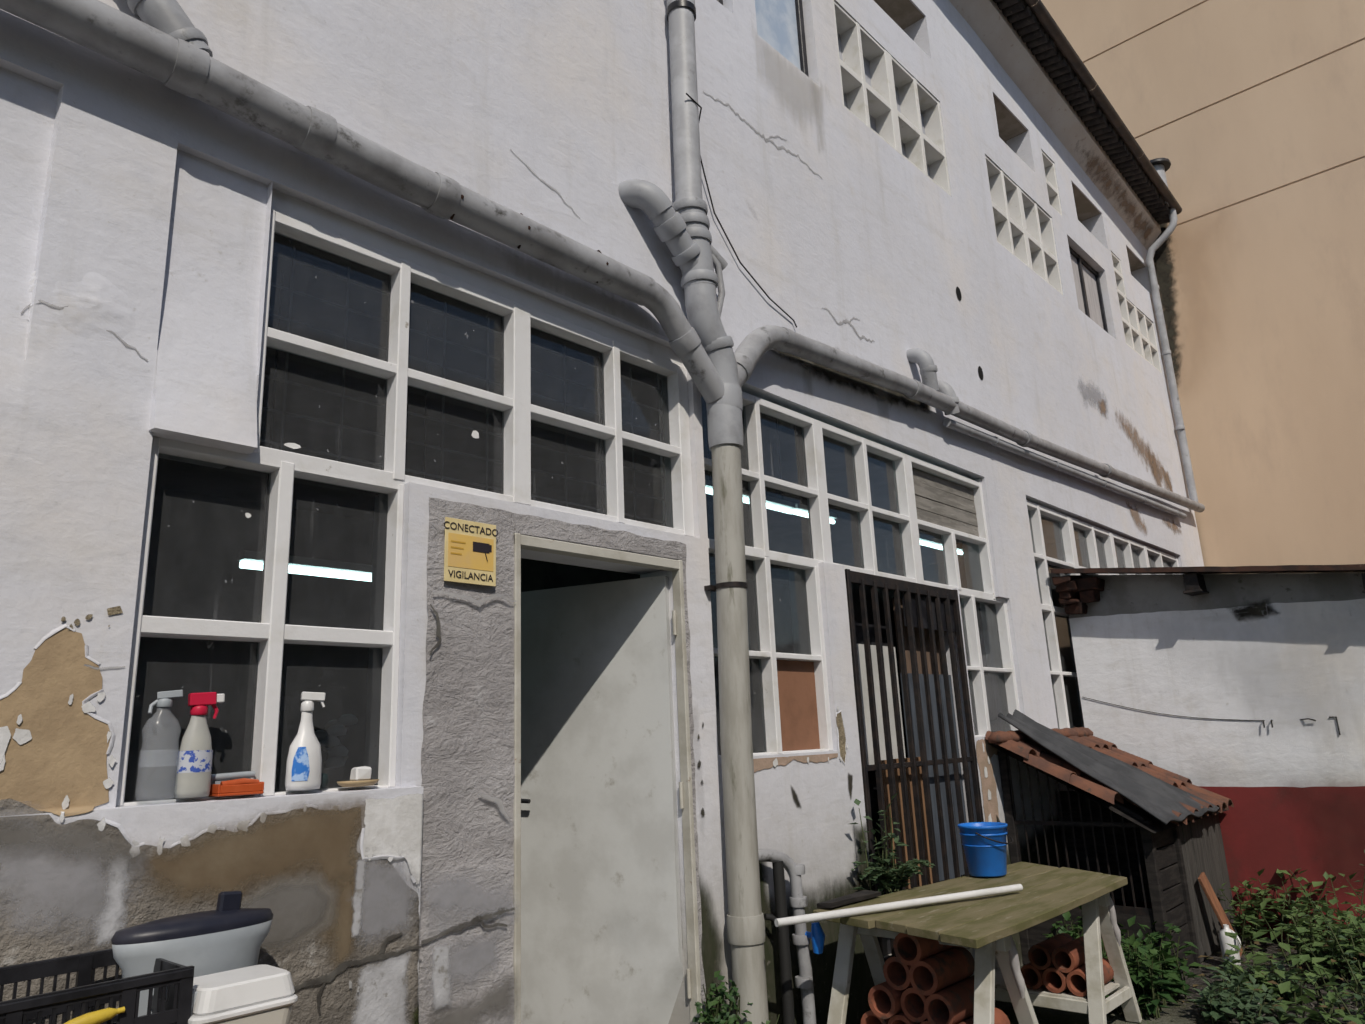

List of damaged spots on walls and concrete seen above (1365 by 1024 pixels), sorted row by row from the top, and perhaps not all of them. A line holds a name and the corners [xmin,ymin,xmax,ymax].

crack [703,91,822,178]
crack [510,149,580,218]
crack [21,300,68,314]
crack [107,330,148,361]
crack [822,308,875,343]
water stain [1082,386,1106,413]
peeling [0,606,318,967]
peeling [753,707,853,797]
peeling [237,793,424,1024]
peeling [2,972,77,1001]
peeling [94,965,122,984]
crack [294,908,515,1014]